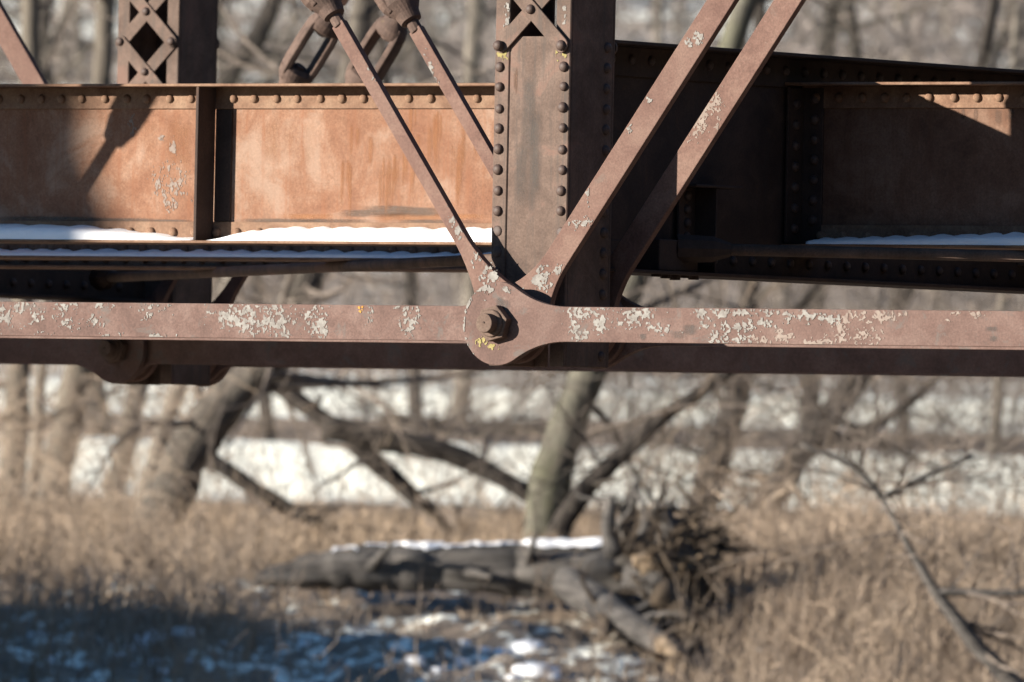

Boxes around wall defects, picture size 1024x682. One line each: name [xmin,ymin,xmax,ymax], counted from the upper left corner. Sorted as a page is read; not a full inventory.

peeling [687,86,725,144]
peeling [147,135,193,215]
peeling [0,302,124,336]
peeling [204,304,331,338]
peeling [393,306,425,337]
peeling [563,307,684,341]
peeling [693,309,908,345]